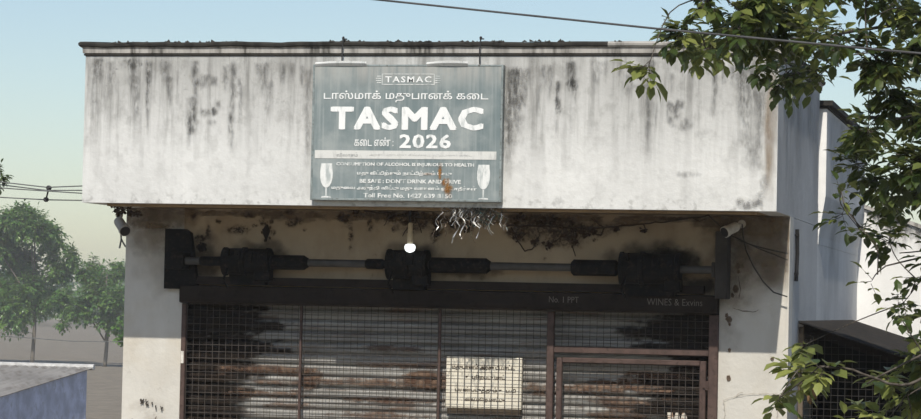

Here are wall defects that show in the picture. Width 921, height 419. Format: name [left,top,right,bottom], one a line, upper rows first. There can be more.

corrosion [220,363,446,419]
corrosion [524,371,689,419]